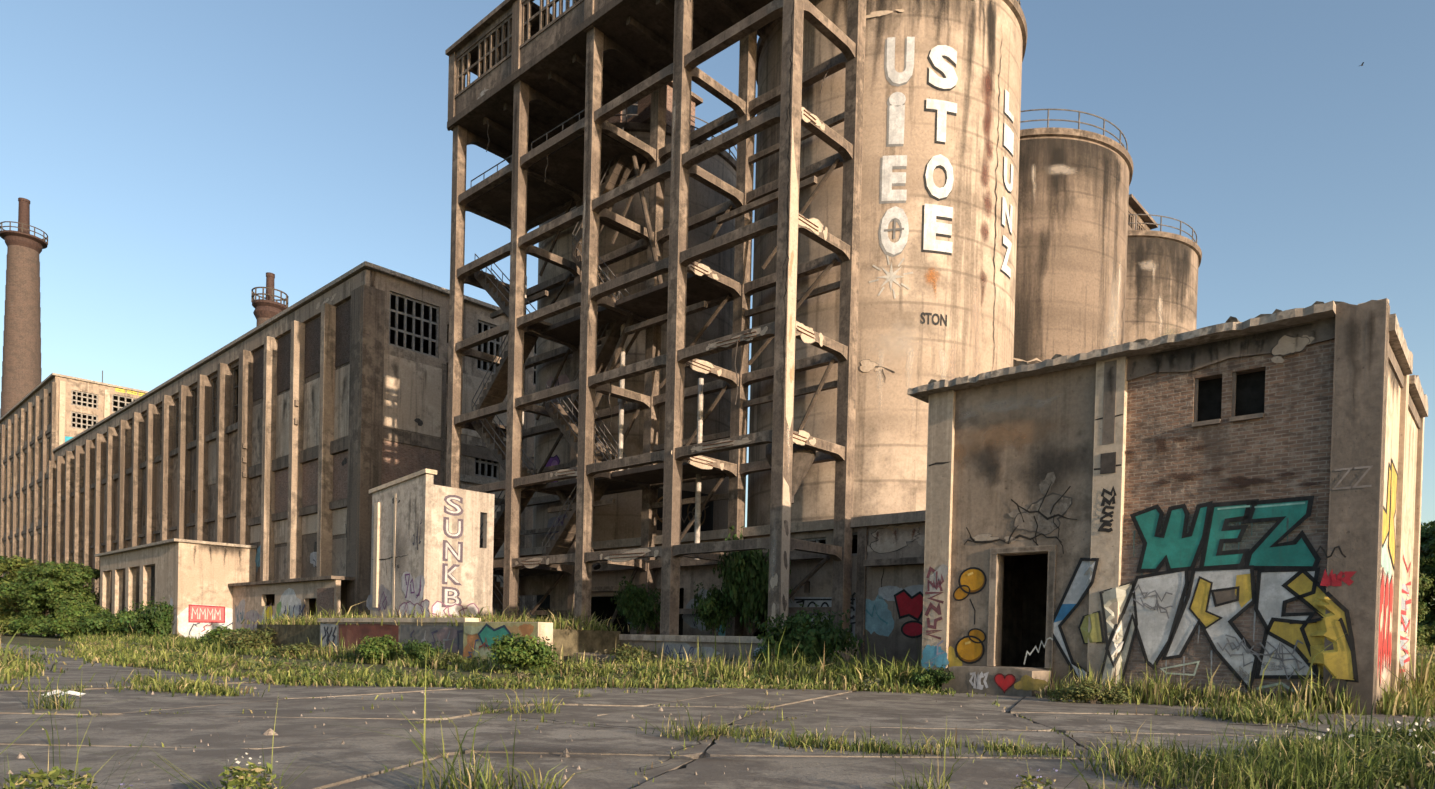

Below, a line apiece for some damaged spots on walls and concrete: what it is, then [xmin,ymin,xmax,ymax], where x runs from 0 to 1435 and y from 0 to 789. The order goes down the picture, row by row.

leakage [917,0,996,65]
rust [982,75,992,238]
leakage [1019,138,1120,197]
leakage [1039,237,1047,276]
leakage [1118,237,1189,300]
leakage [1013,292,1033,367]
crack [964,464,1121,554]
crack [407,713,807,772]